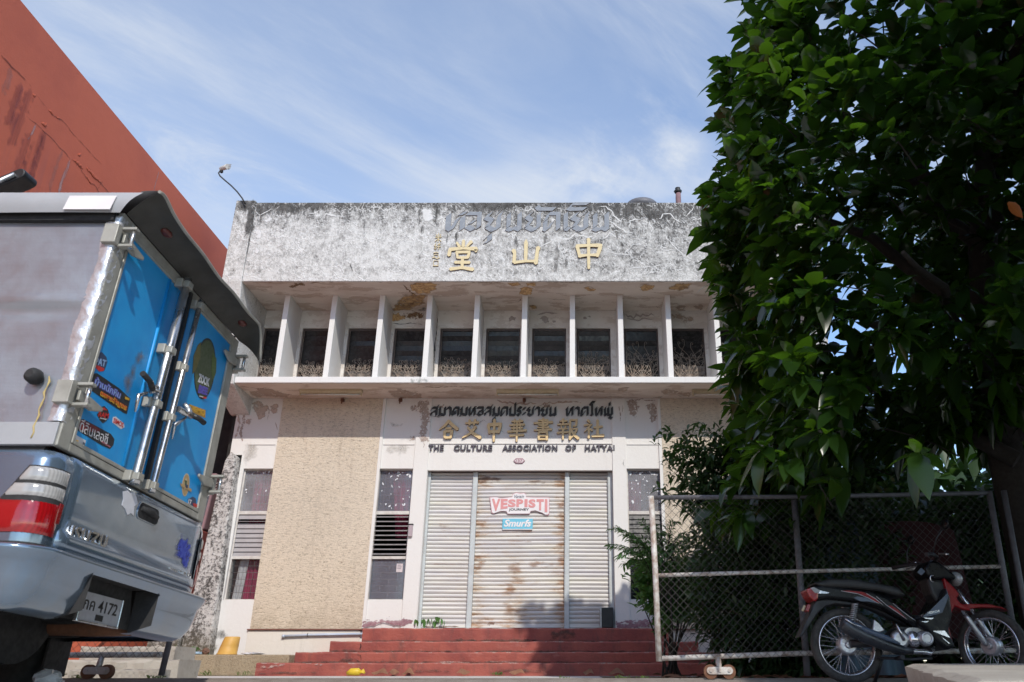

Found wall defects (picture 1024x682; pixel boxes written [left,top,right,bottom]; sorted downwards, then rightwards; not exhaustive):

crack [1,55,109,193]
damp [473,203,708,227]
peeling [243,386,291,424]
peeling [389,386,444,445]
peeling [619,387,691,422]